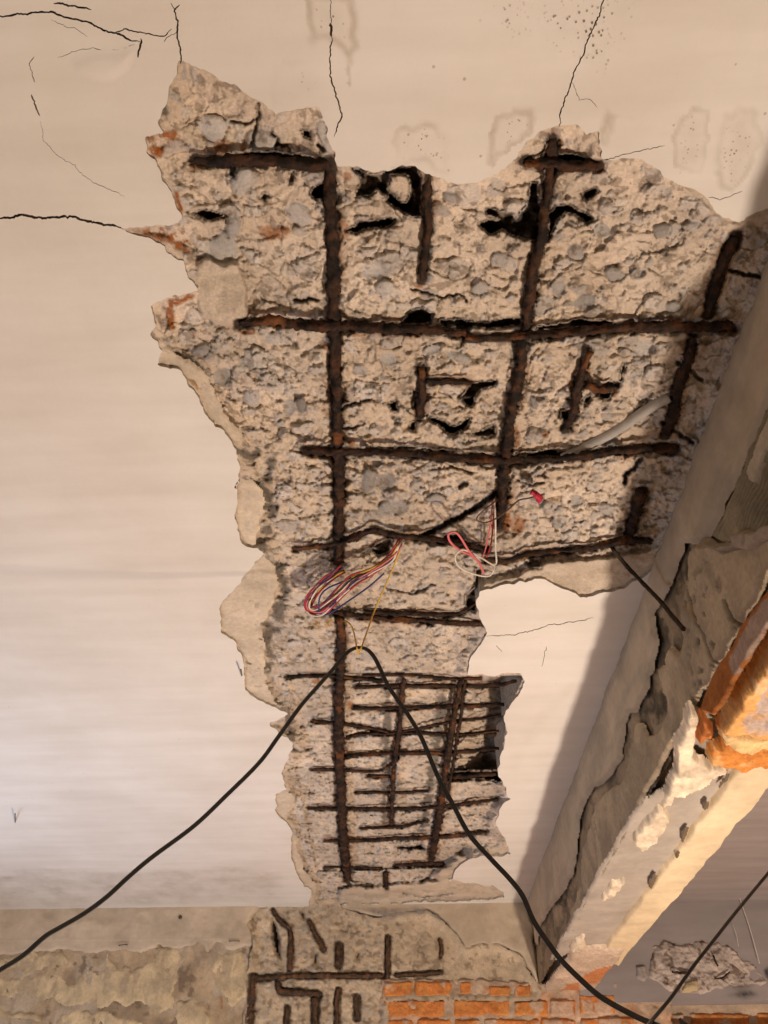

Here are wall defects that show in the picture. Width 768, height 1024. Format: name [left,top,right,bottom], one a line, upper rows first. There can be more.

crack [0,2,182,64]
crack [329,0,343,136]
crack [559,0,604,127]
crack [29,57,124,196]
corrosion [148,131,177,157]
crack [0,214,121,228]
corrosion [143,229,189,252]
spalling [121,61,768,1024]
flaking render [0,948,215,1024]